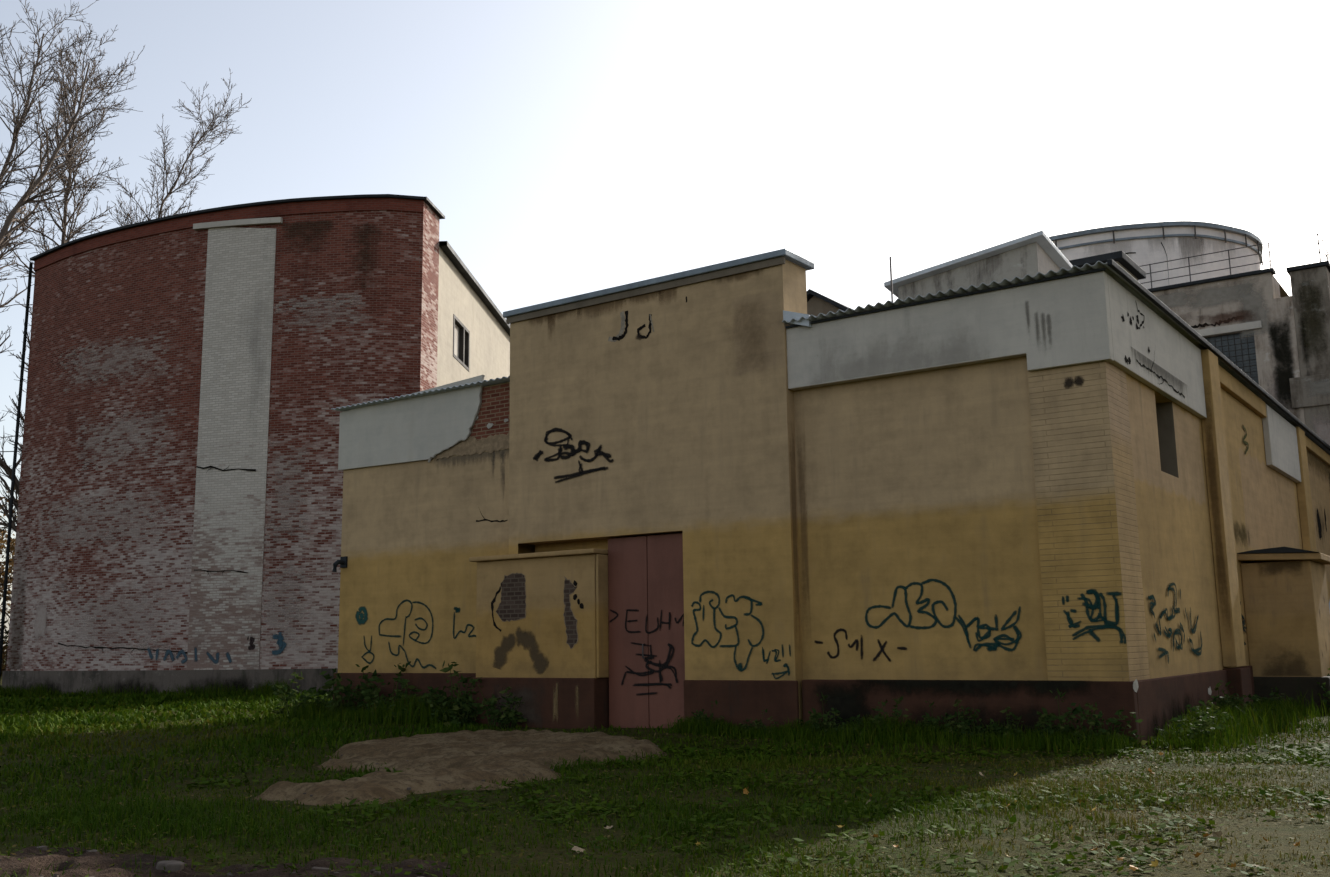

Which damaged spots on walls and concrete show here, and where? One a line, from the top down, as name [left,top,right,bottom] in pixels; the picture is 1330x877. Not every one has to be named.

crack [1136,303,1185,398]
water stain [1270,287,1325,408]
spalling [424,375,510,463]
crack [197,464,256,472]
crack [194,568,248,576]